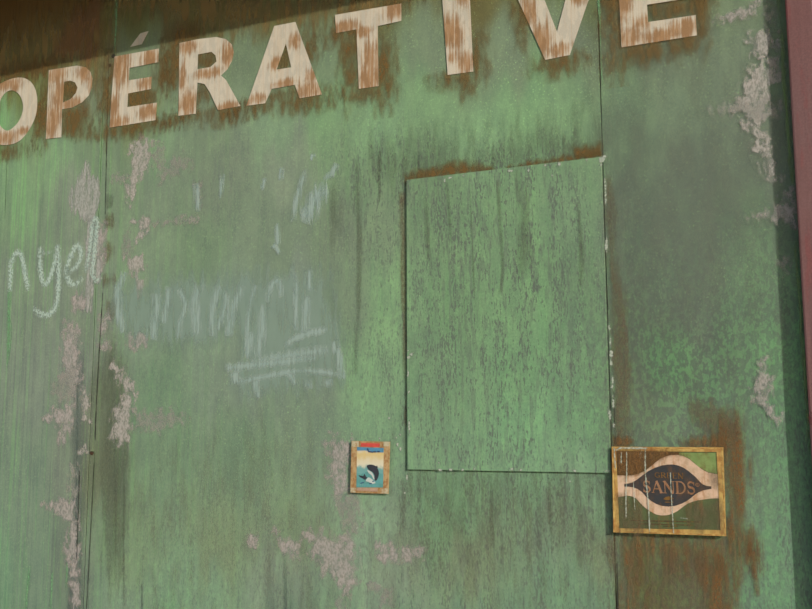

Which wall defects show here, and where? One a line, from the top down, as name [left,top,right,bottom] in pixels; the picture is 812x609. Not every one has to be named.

rust [35,91,47,138]
rust [62,81,88,137]
rust [128,89,155,107]
rust [117,0,402,88]
rust [331,29,393,105]
peeling [718,30,782,181]
peeling [113,135,164,209]
peeling [43,161,107,444]
peeling [109,362,183,448]
peeling [40,467,81,609]
peeling [274,438,359,601]
rust [613,418,758,609]